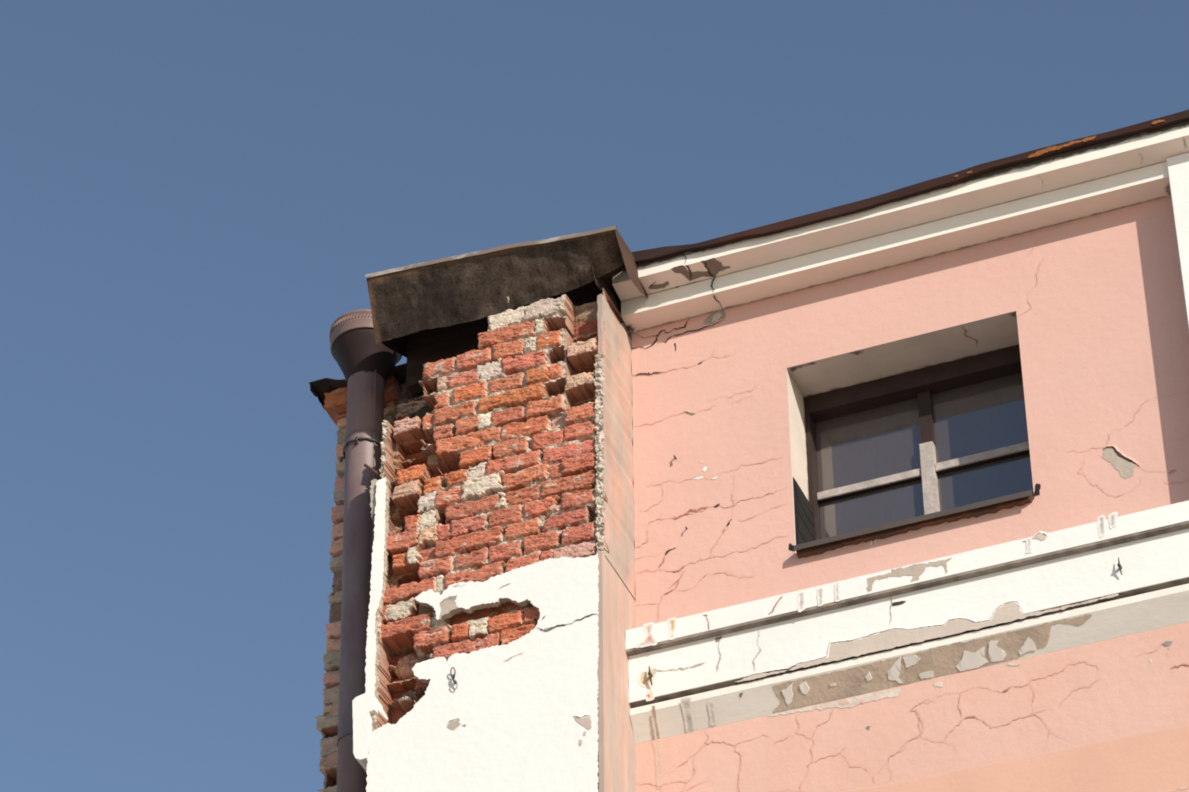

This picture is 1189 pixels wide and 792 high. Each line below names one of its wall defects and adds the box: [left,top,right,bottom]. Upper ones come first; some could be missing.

corrosion [1027,136,1096,158]
crack [631,250,726,376]
peeling [649,258,731,289]
spalling [1102,445,1142,478]
crack [1066,392,1186,497]
crack [634,458,788,623]
spalling [439,595,458,618]
crack [503,614,593,661]
peeling [735,593,1118,716]
crack [637,661,1099,792]